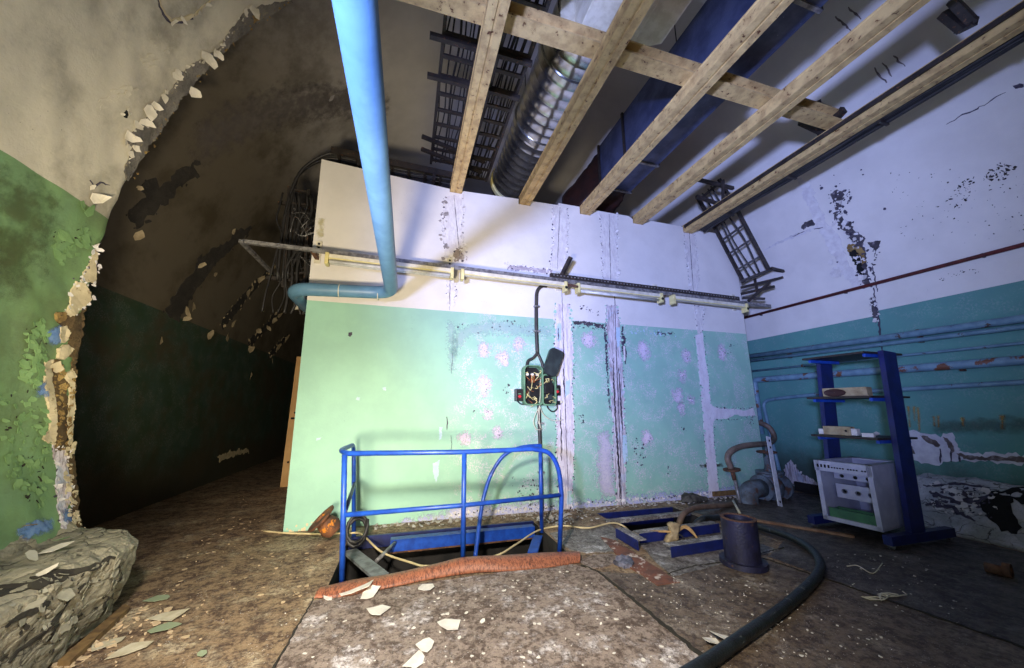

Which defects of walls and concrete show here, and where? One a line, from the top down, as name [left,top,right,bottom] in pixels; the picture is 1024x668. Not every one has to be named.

spalling [120,0,293,240]
crack [946,92,1006,125]
peeling [163,225,255,323]
spalling [815,175,883,350]
spalling [0,180,126,659]
peeling [447,296,676,510]
peeling [909,430,1024,466]
spalling [980,486,1024,534]